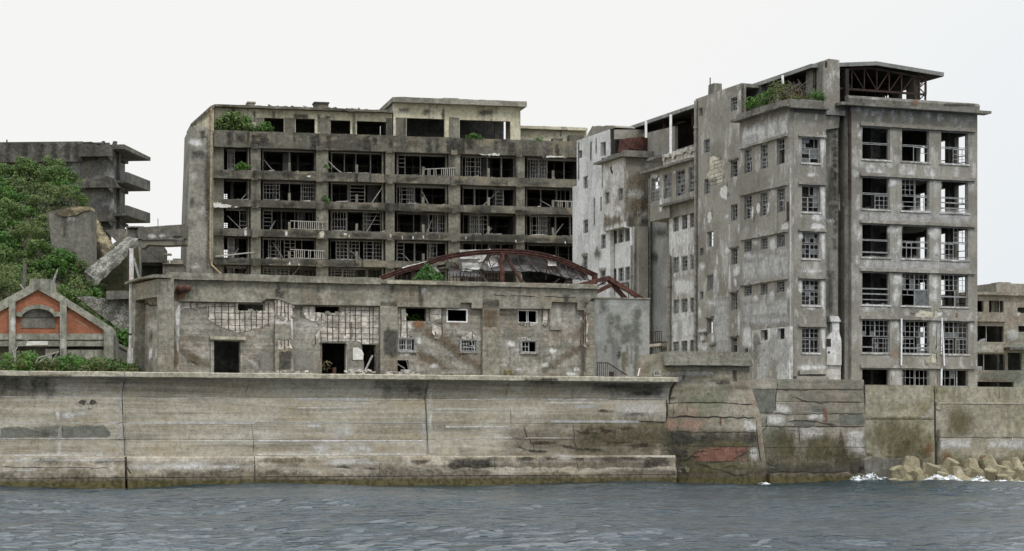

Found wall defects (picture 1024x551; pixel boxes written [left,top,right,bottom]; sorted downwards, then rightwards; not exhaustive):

flaking render [706,153,728,203]
spalling [175,299,379,352]
crack [638,309,1019,476]
water stain [0,412,255,460]
water stain [936,431,970,453]
water stain [989,422,1022,448]